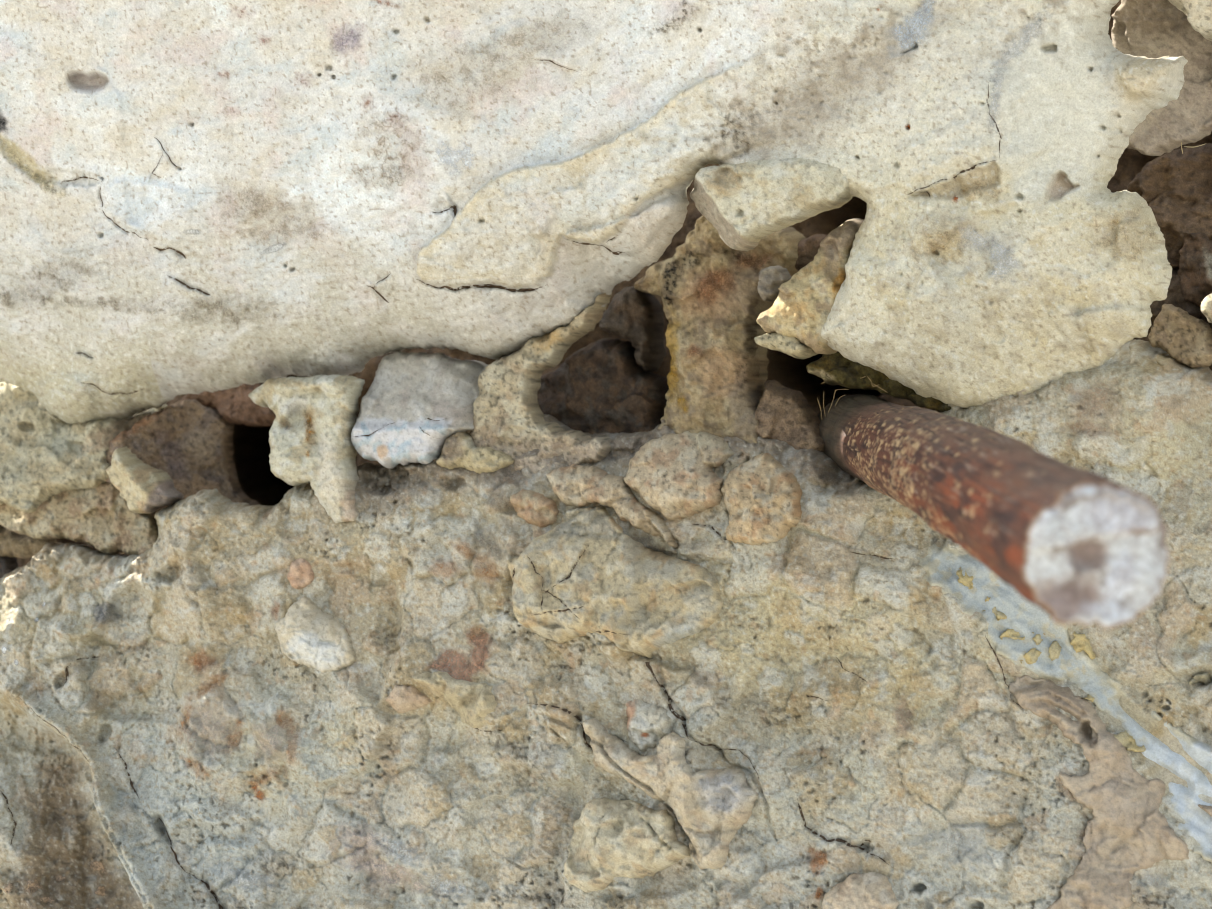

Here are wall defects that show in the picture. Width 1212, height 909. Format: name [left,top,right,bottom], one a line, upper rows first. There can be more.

crack [512,545,628,635]
crack [985,635,1027,714]
crack [527,703,592,748]
crack [645,658,759,778]
crack [114,747,139,798]
crack [2,793,17,844]
crack [159,818,223,909]
crack [797,795,892,867]